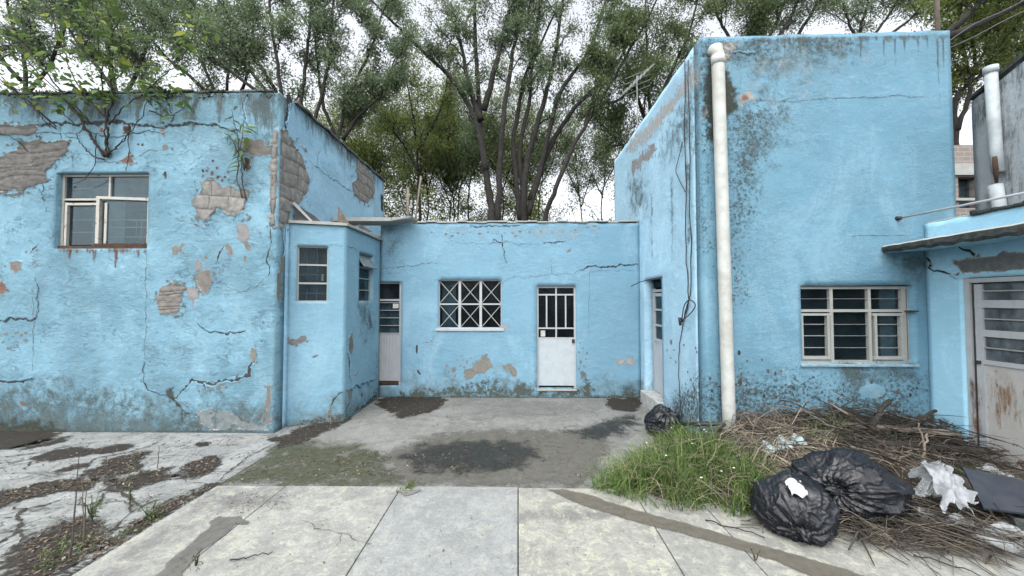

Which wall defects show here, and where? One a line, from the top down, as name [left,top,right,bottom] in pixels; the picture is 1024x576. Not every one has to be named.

spalling [0,121,74,199]
spalling [190,128,312,262]
spalling [351,156,375,208]
water stain [627,35,944,301]
crack [0,244,41,383]
water stain [0,378,173,433]
spalling [153,256,216,318]
crack [140,257,255,424]
peeling [417,354,523,384]
crack [450,223,639,310]
water stain [734,361,961,437]
crack [925,246,979,279]